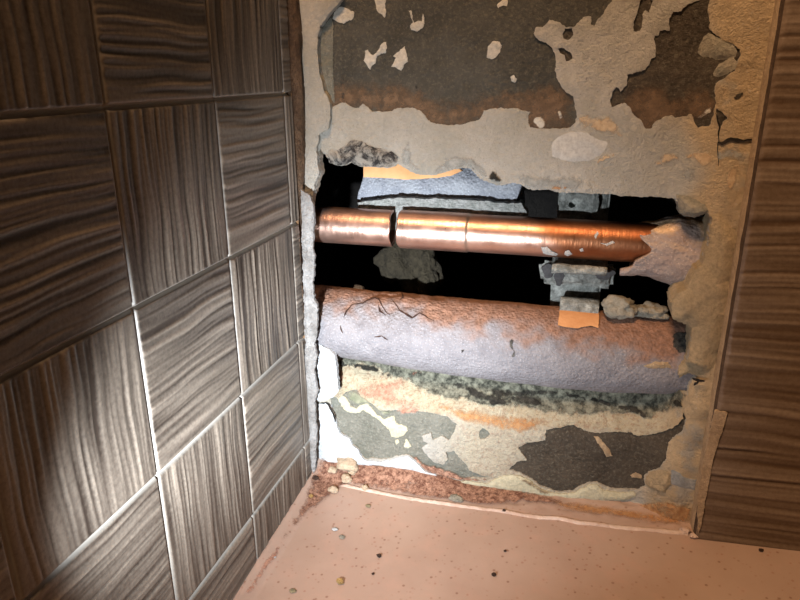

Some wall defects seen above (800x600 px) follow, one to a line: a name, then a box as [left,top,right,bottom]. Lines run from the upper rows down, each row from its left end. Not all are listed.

flaking render [320,0,612,129]
flaking render [610,0,740,129]
flaking render [326,140,398,168]
leakage [338,358,683,418]
flaking render [316,390,686,501]